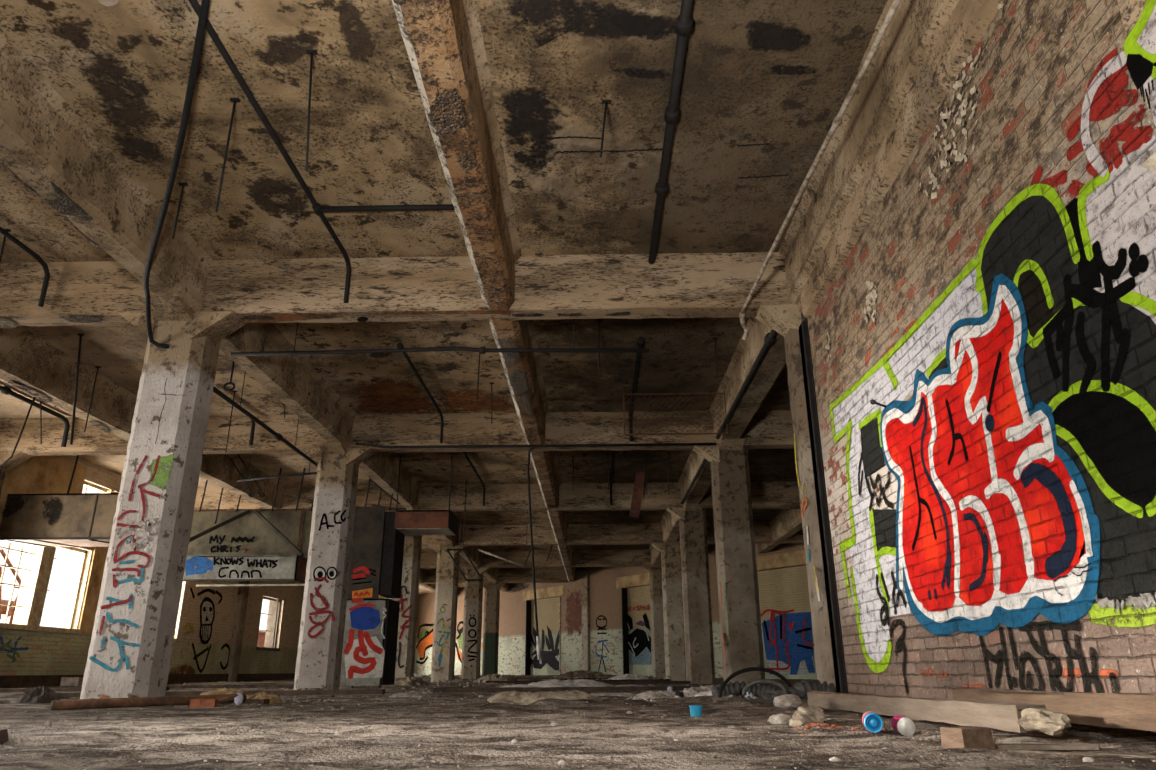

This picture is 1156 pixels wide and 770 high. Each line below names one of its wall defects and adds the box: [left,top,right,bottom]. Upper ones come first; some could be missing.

water stain [48,16,164,164]
spalling [428,88,467,139]
water stain [501,88,562,175]
water stain [508,0,676,48]
water stain [613,68,669,78]
water stain [745,20,817,75]
peeling [919,47,981,199]
water stain [246,177,309,221]
water stain [43,497,62,525]